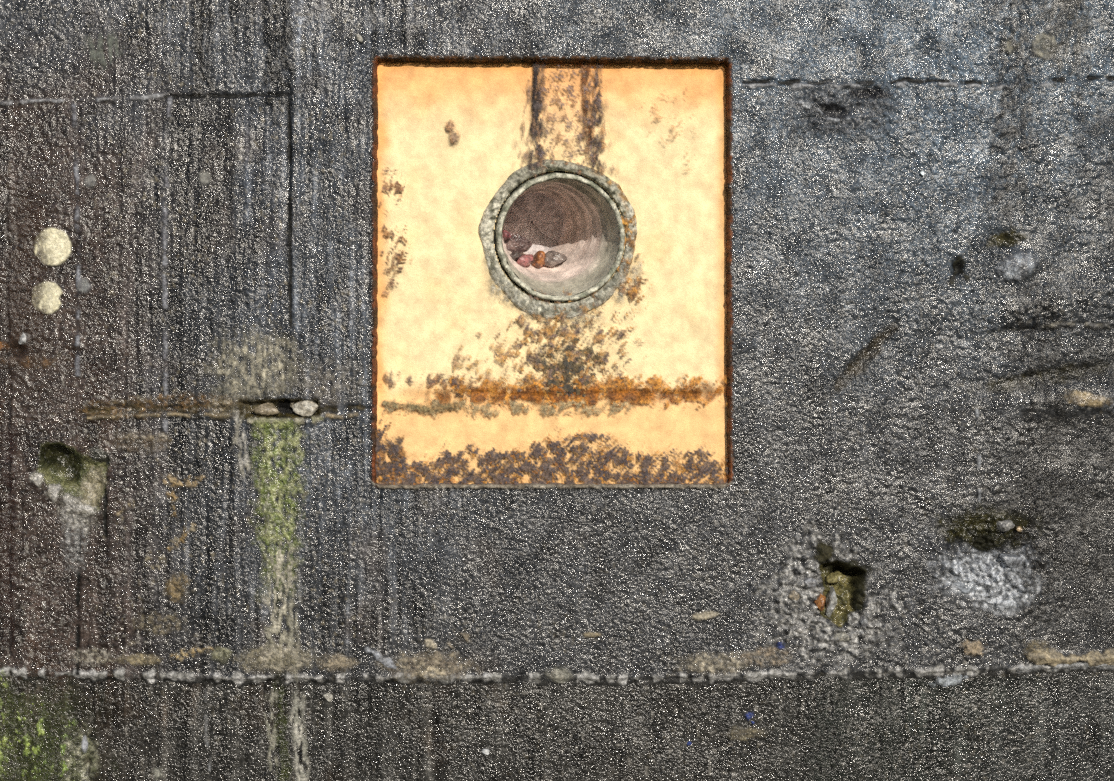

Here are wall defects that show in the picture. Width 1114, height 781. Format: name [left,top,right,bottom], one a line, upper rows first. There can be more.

corrosion [371,55,734,489]
hole [29,443,111,567]
spalling [756,524,900,666]
spalling [939,500,1052,616]